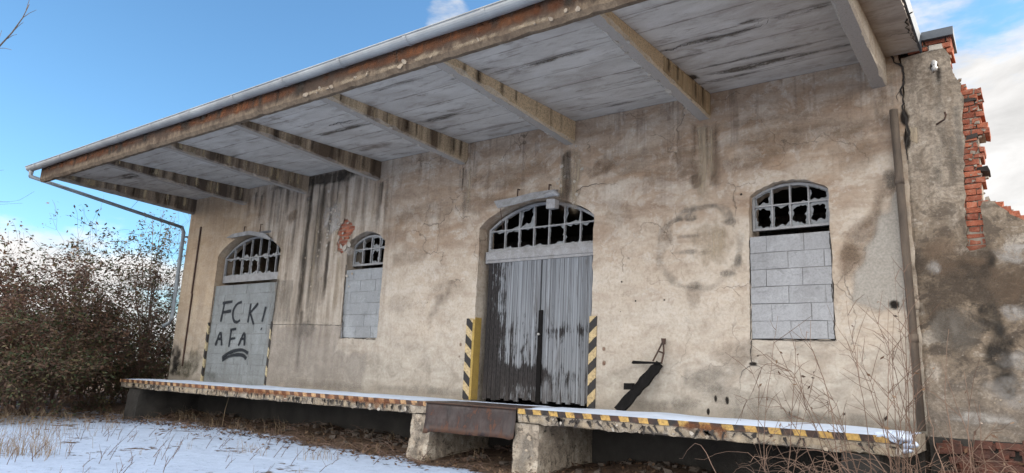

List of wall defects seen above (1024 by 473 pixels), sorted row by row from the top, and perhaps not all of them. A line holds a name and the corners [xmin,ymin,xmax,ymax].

rust [49,133,147,170]
rust [173,81,303,130]
water stain [270,158,364,311]
flaking render [305,190,357,287]
water stain [979,286,1023,398]
water stain [964,413,1013,423]